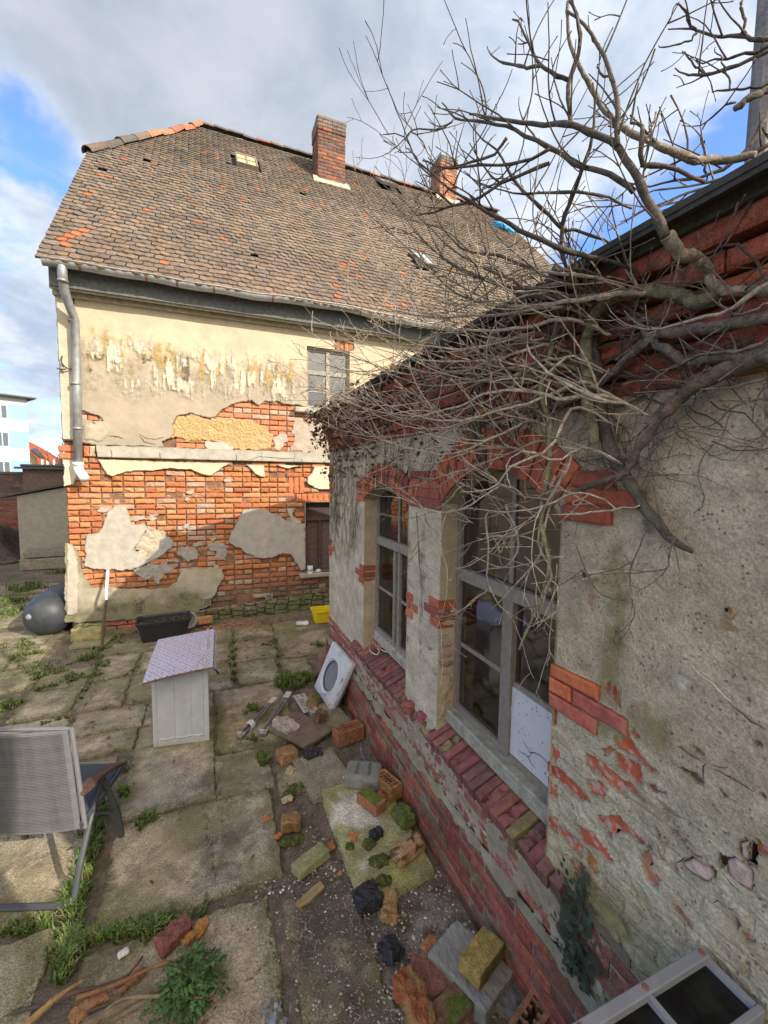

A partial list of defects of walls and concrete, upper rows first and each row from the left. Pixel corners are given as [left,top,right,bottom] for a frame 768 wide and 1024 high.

peeling [58,401,330,602]
peeling [604,682,622,707]
peeling [547,730,660,800]
peeling [549,815,660,886]
spalling [675,840,768,889]